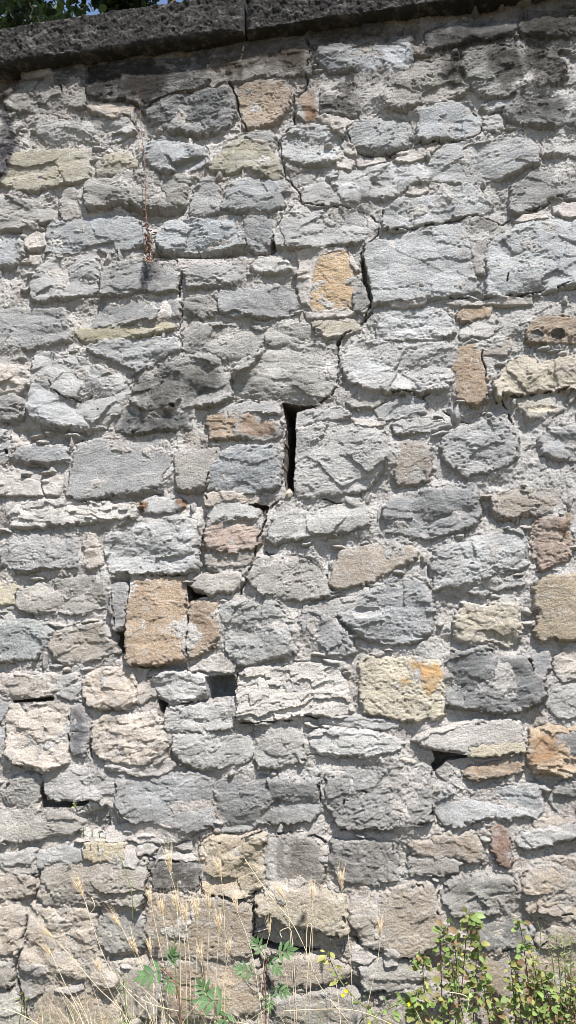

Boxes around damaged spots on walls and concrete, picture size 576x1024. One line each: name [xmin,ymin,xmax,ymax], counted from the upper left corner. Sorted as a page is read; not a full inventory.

crack [259,41,562,404]